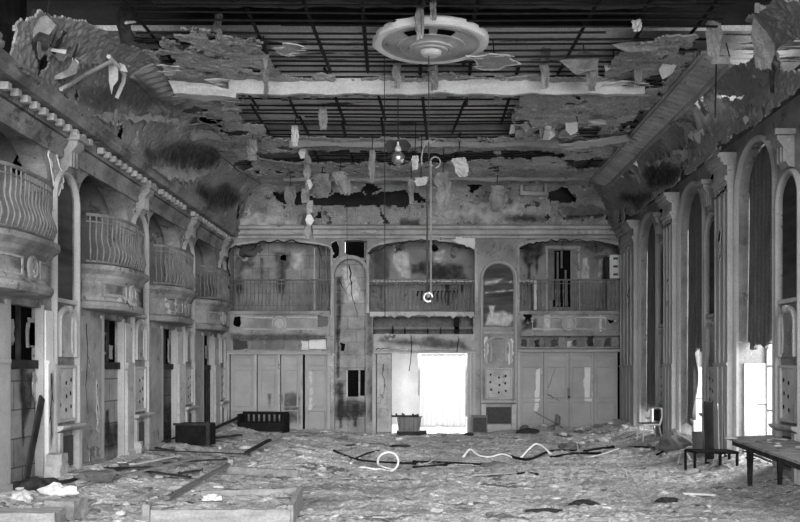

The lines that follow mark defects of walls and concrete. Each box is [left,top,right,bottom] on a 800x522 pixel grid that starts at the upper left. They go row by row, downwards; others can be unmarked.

flaking render [157,64,180,76]
flaking render [171,93,242,111]
flaking render [600,80,655,100]
flaking render [86,109,232,142]
flaking render [558,119,630,151]
flaking render [152,164,214,187]
flaking render [291,213,321,233]
water stain [275,251,303,299]
crack [339,265,358,318]
water stain [523,244,543,279]
water stain [336,267,372,427]
water stain [20,369,36,441]